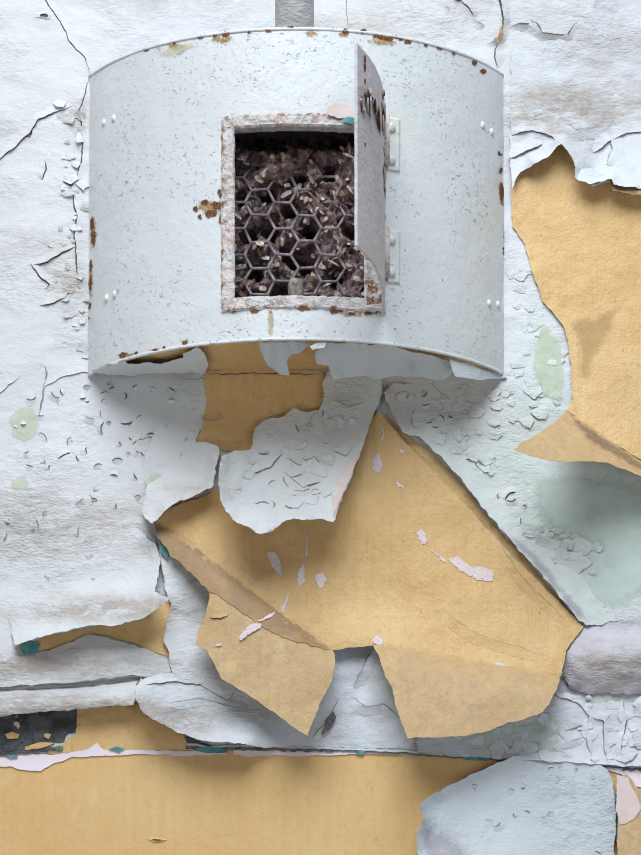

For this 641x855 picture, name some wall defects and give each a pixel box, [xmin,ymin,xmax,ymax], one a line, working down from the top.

crack [0,0,93,306]
crack [346,0,354,29]
crack [458,0,478,17]
crack [487,0,578,68]
peeling [506,0,641,476]
peeling [0,369,641,855]